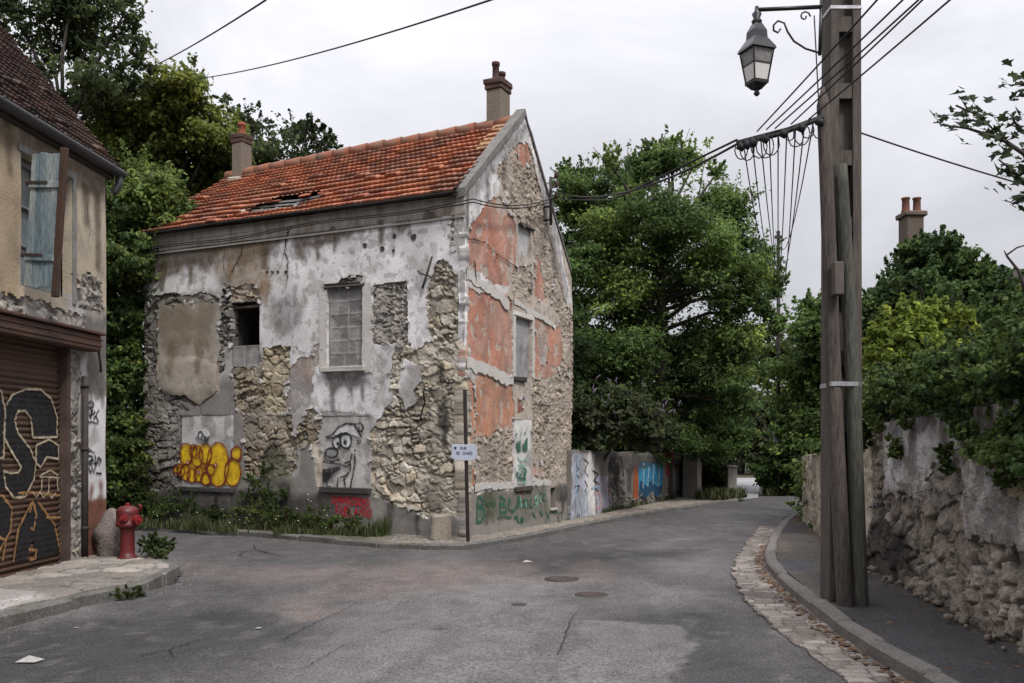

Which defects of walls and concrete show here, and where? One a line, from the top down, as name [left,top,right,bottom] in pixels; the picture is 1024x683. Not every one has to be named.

flaking render [0,273,106,328]
flaking render [71,351,82,555]
flaking render [143,282,323,493]
water stain [149,226,362,291]
water stain [397,210,436,235]
flaking render [338,141,574,519]